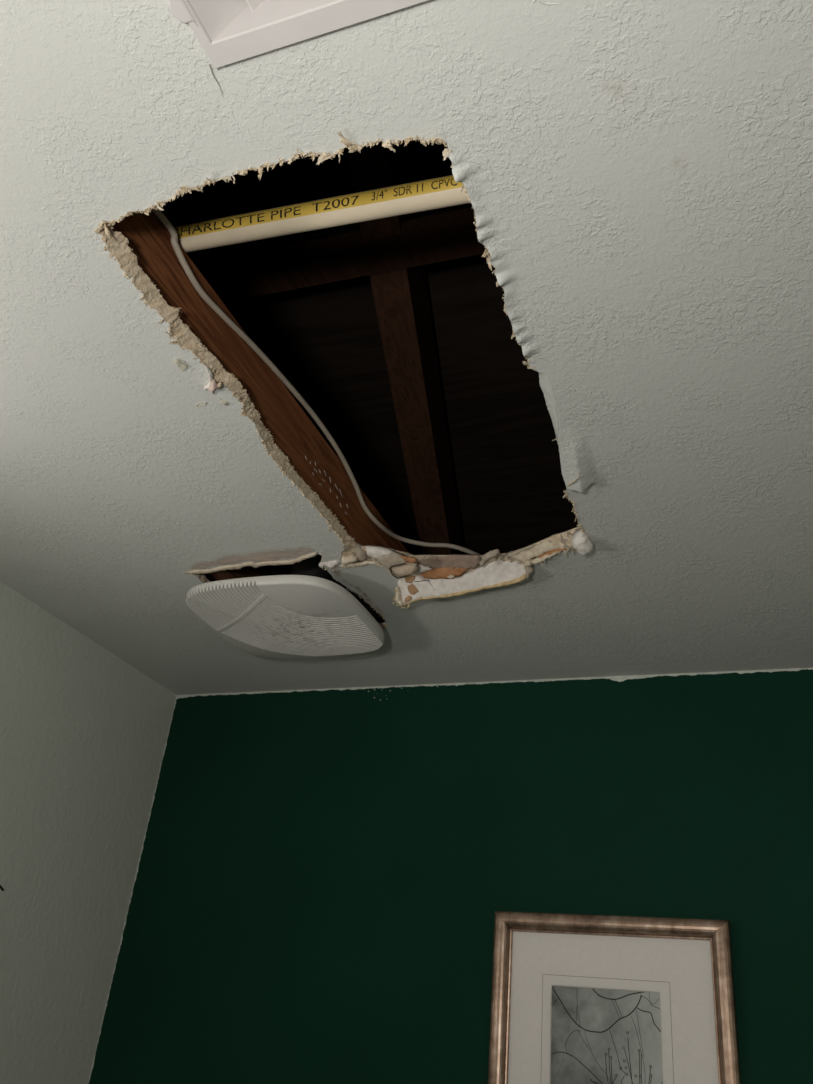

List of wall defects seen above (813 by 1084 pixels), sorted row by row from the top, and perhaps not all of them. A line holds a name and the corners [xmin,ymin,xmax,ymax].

spalling [482,247,521,345]
spalling [94,131,477,562]
spalling [460,488,590,576]